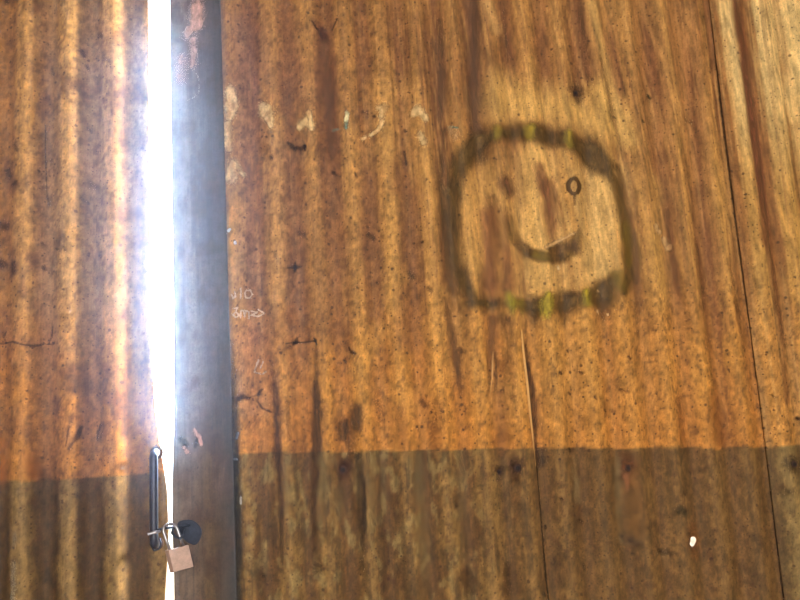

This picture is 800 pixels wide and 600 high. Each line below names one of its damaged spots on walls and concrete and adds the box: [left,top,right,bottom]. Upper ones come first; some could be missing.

peeling [179,0,203,81]
peeling [258,102,274,128]
peeling [296,110,315,131]
peeling [361,103,387,140]
peeling [410,105,428,121]
crack [710,13,784,600]